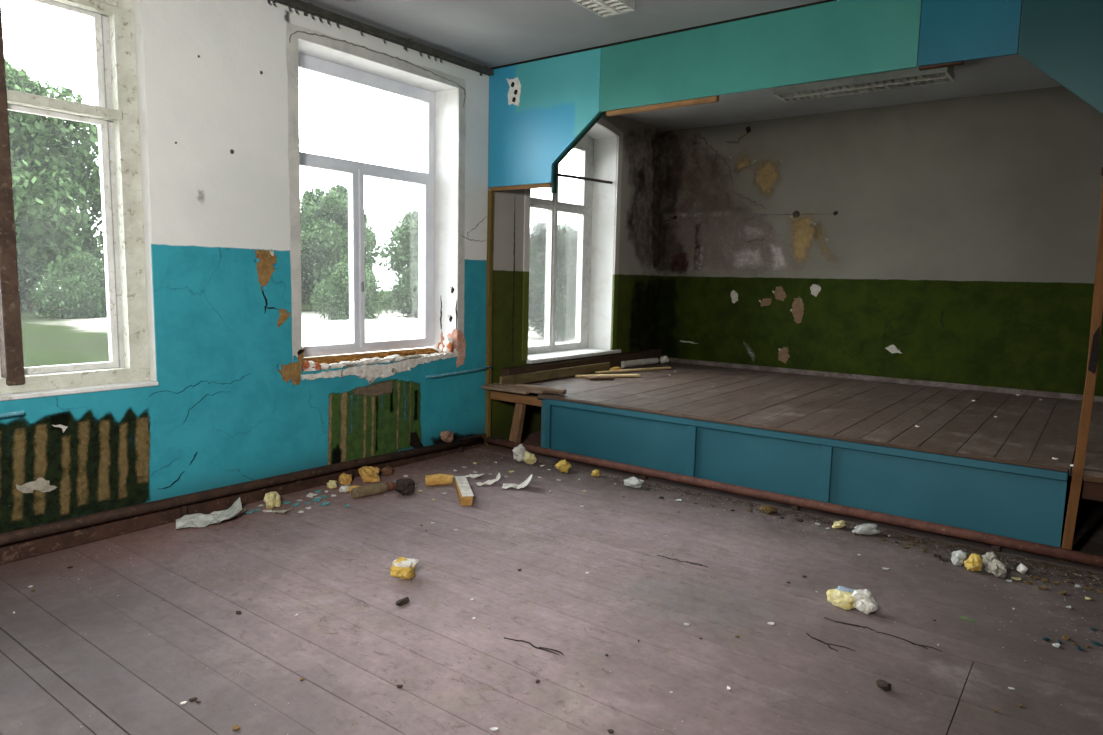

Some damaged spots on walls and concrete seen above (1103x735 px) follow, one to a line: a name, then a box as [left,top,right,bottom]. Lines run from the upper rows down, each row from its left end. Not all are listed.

water stain [627,131,787,356]
peeling [254,249,278,291]
peeling [277,308,291,328]
spalling [759,284,821,323]
spalling [276,348,344,386]
spalling [778,346,790,364]
crack [149,374,249,422]
flaking render [16,478,57,493]
crack [162,452,197,489]